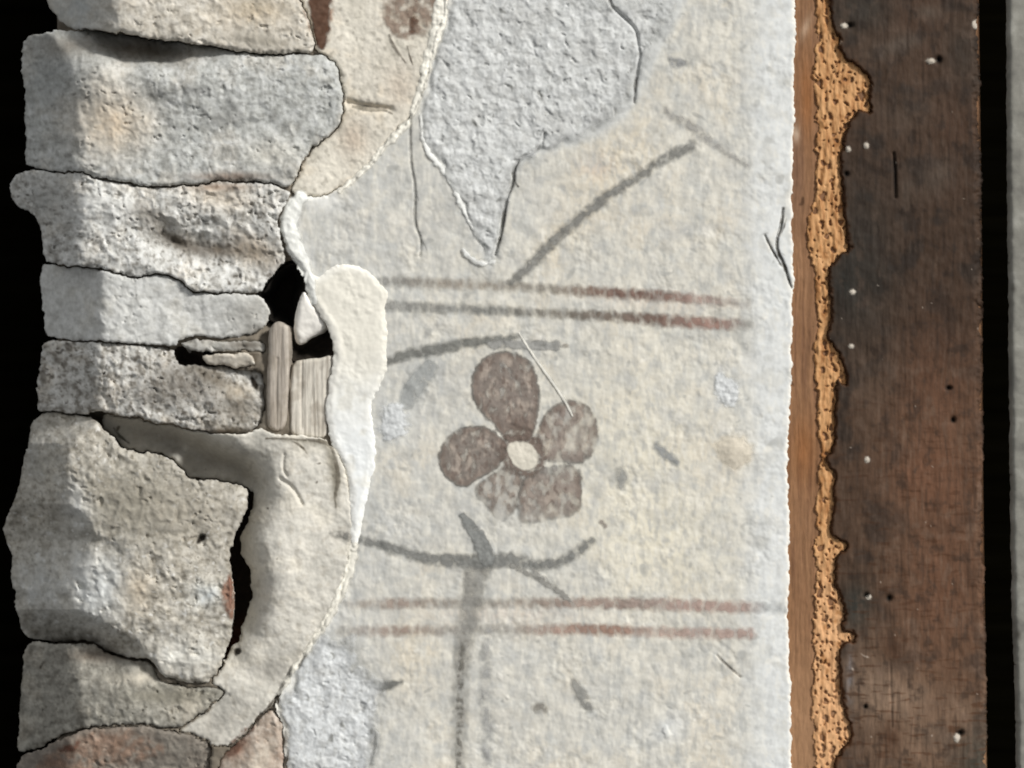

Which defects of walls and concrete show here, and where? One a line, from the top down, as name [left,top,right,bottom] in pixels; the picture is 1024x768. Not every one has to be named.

spalling [338,0,673,266]
crack [497,160,520,248]
crack [770,217,792,288]
spalling [275,543,381,768]